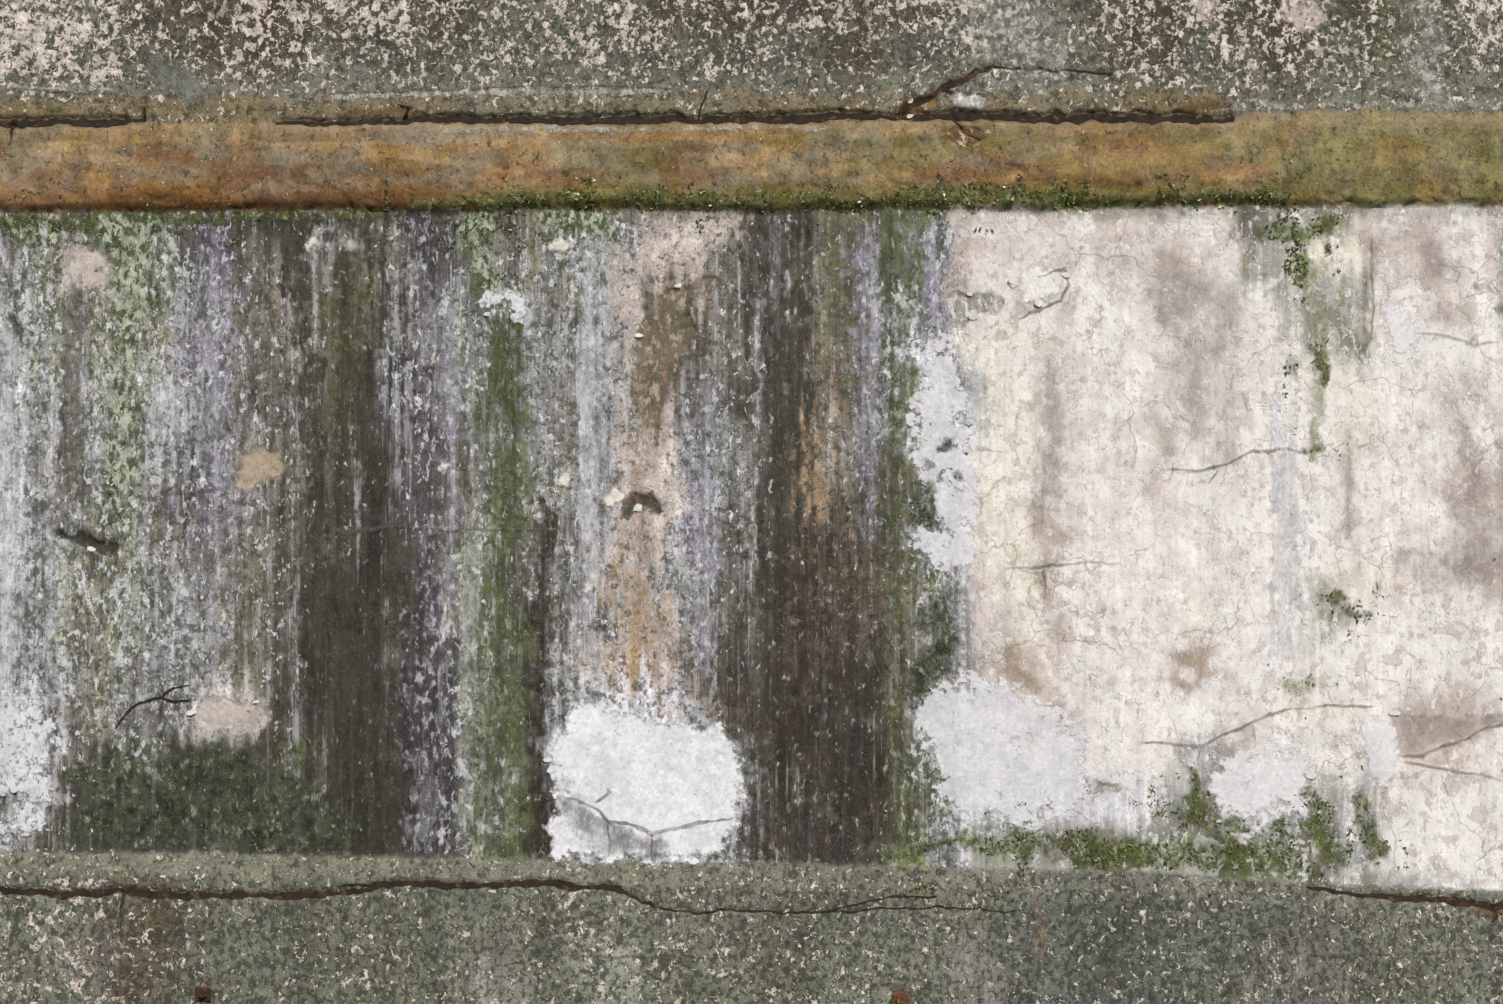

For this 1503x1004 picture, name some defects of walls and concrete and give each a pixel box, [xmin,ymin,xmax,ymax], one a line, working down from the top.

crack [0,87,146,144]
crack [275,65,1234,171]
water stain [142,337,233,470]
spalling [55,529,120,555]
water stain [262,211,514,854]
water stain [522,244,666,856]
spalling [603,488,661,517]
water stain [694,212,888,862]
peeling [543,700,747,866]
peeling [914,667,1121,831]
crack [0,879,1016,934]
crack [1306,886,1503,954]